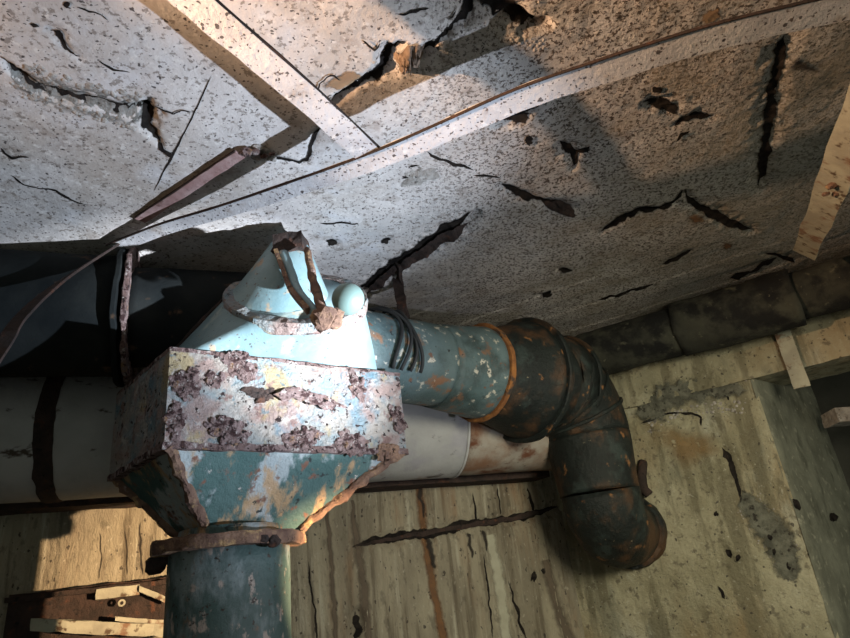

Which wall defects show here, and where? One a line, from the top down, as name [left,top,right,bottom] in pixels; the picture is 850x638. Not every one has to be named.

spalling [318,0,547,105]
crack [1,148,86,205]
crack [5,59,211,190]
spalling [503,105,539,124]
spalling [560,141,590,165]
crack [527,488,535,511]
crack [722,448,742,501]
rust [416,488,447,638]